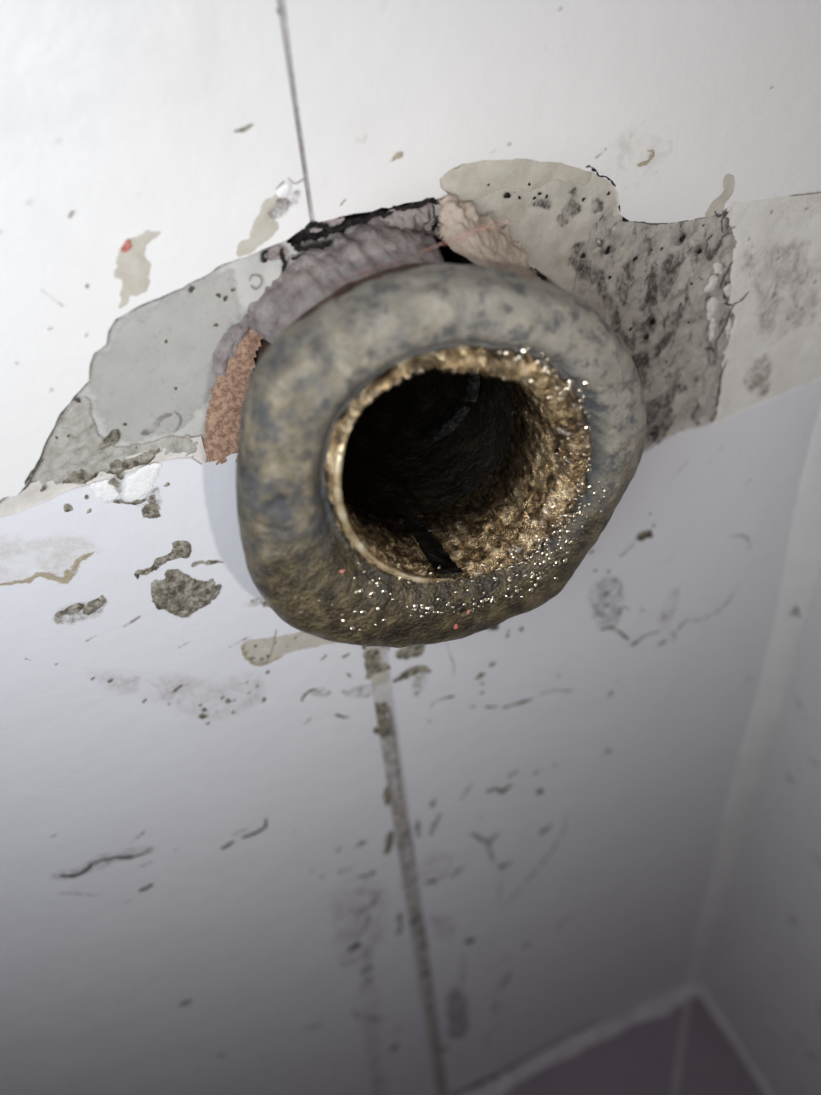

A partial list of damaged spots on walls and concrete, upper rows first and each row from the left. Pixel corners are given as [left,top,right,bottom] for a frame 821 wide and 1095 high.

spalling [21,159,749,492]
peeling [240,629,337,666]